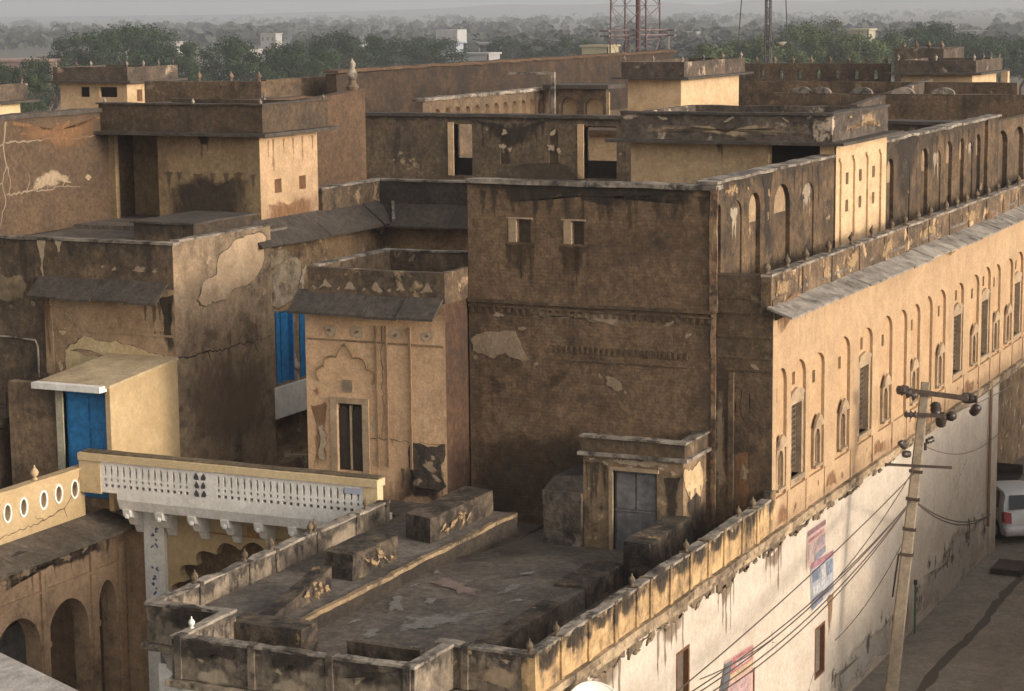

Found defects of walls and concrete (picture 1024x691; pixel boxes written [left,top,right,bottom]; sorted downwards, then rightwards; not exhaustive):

crack [0,122,101,224]
water stain [172,178,244,213]
peeling [196,231,432,310]
peeling [58,328,165,371]
crack [178,334,272,369]
peeling [470,326,538,366]
peeling [408,443,447,497]
water stain [664,477,680,516]
water stain [657,511,757,593]
spalling [569,457,896,691]
water stain [765,542,783,588]
water stain [656,613,684,666]